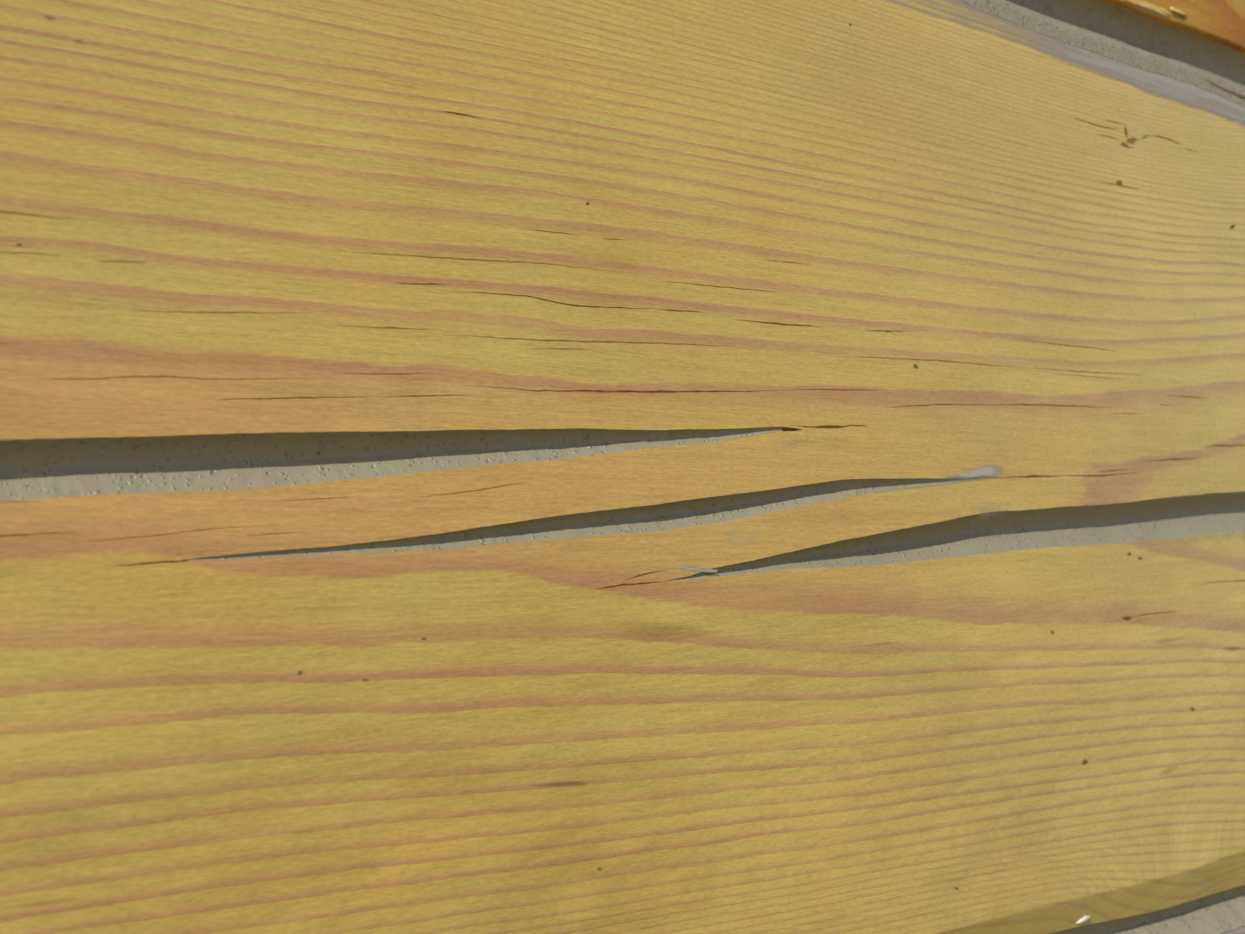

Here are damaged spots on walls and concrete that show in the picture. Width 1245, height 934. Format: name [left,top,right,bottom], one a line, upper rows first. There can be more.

crack [134,307,295,315]
crack [351,323,414,331]
crack [460,320,812,349]
crack [475,259,804,312]
crack [0,330,1207,502]
crack [0,437,1245,589]